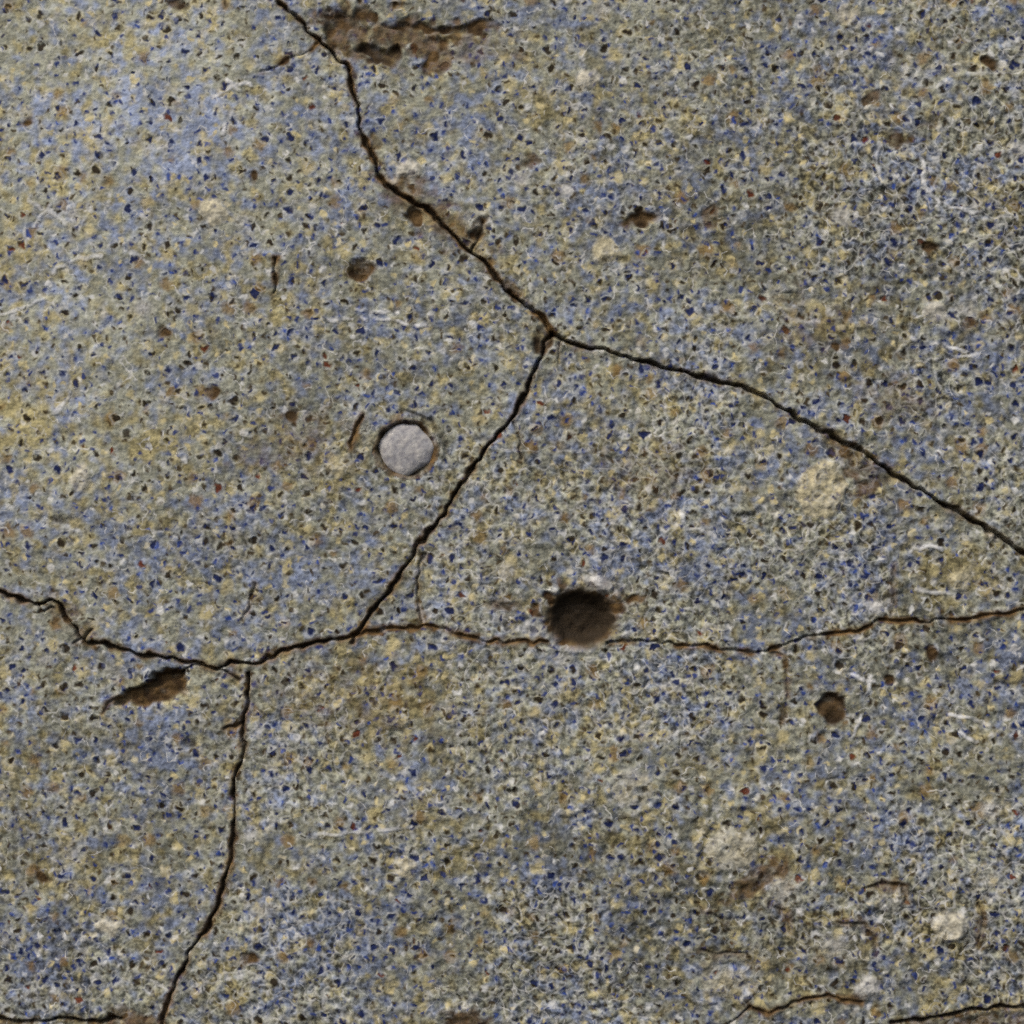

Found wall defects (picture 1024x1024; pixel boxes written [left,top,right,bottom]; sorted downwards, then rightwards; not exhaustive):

crack [256,0,397,190]
crack [0,587,65,615]
crack [69,214,1024,1024]
peeling [542,637,593,656]
spalling [98,666,191,718]
spalling [815,691,847,729]
crack [0,1013,108,1024]